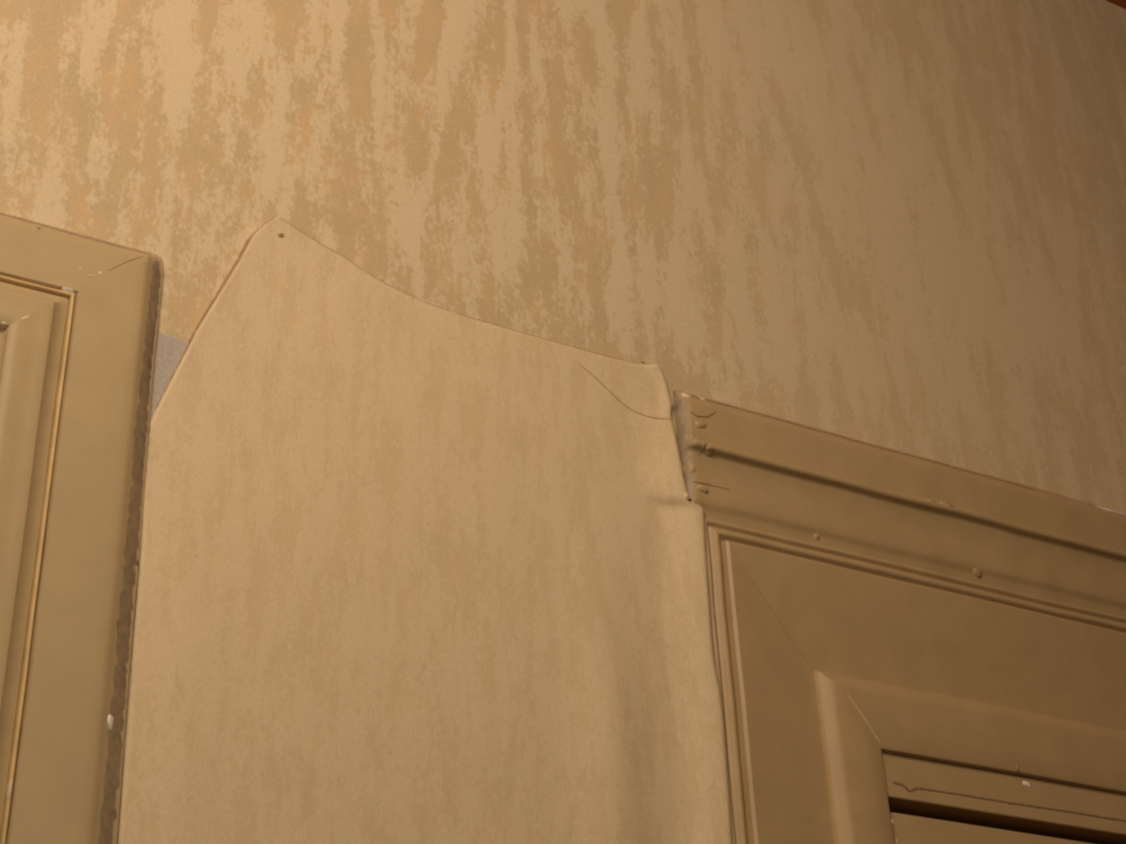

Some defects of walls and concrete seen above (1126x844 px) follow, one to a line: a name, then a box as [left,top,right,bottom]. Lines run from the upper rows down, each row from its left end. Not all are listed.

flaking render [150,330,188,421]